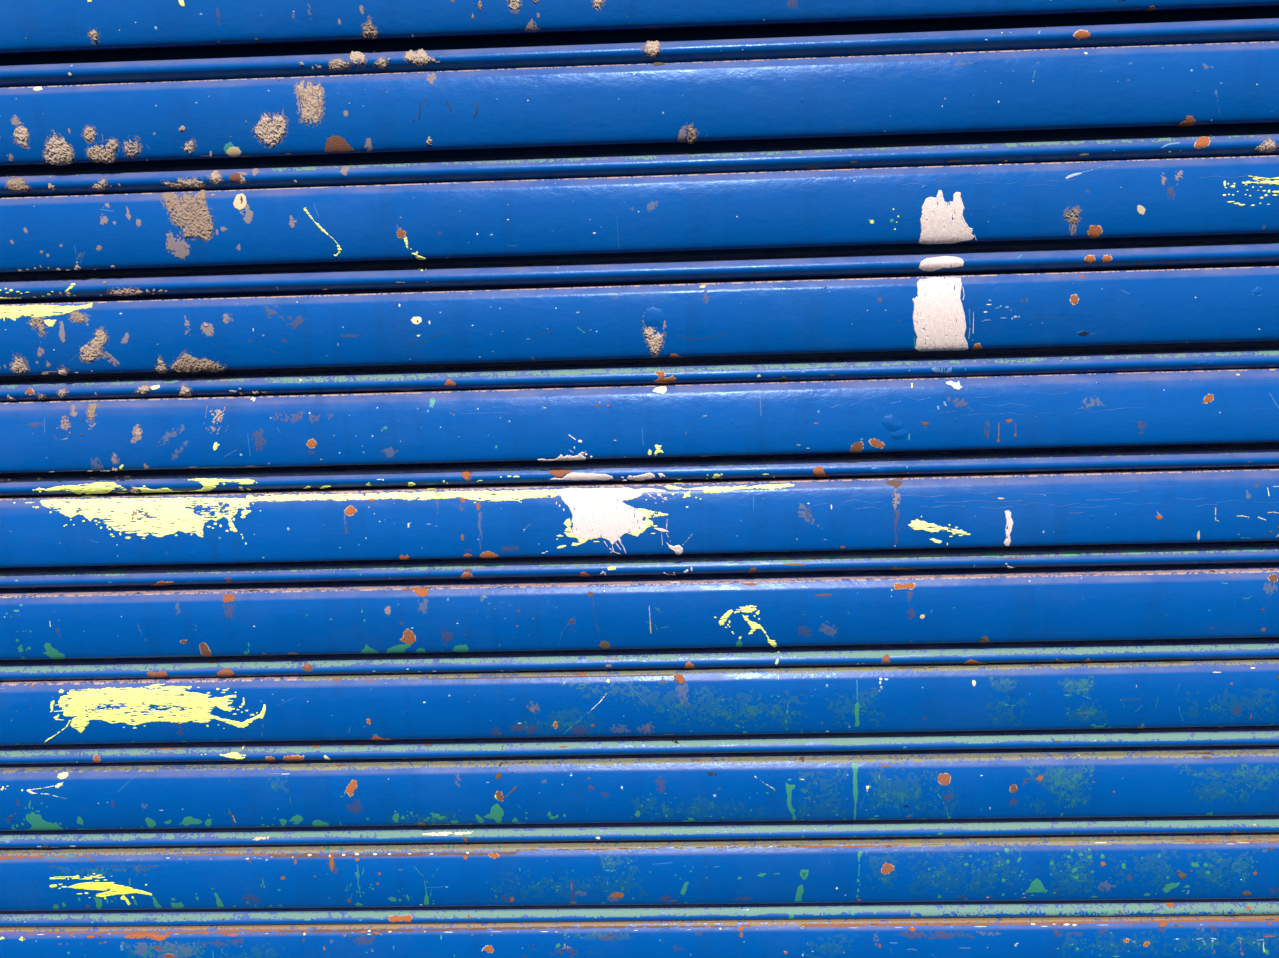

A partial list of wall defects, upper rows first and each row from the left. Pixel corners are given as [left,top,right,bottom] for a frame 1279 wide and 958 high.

corrosion [401,629,416,644]
corrosion [938,773,950,785]